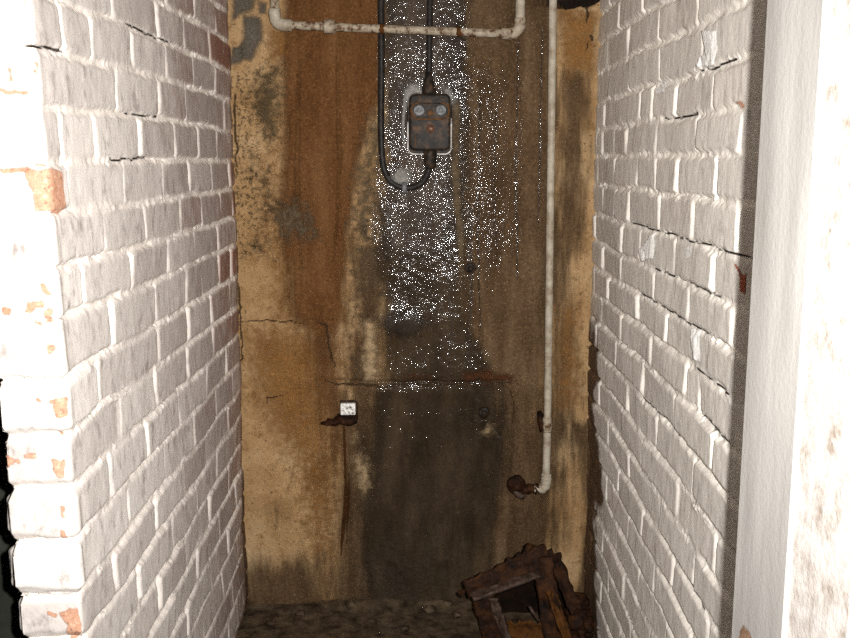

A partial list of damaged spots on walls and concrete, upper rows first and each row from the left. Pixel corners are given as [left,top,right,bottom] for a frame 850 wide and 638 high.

crack [26,44,61,52]
crack [126,23,168,43]
crack [701,58,738,72]
mould [232,67,279,160]
peeling [0,164,66,214]
crack [633,223,753,259]
rust [250,0,378,555]
damp [240,0,603,638]
crack [642,293,709,334]
crack [236,268,514,424]
peeling [36,397,68,418]
peeling [47,608,82,638]